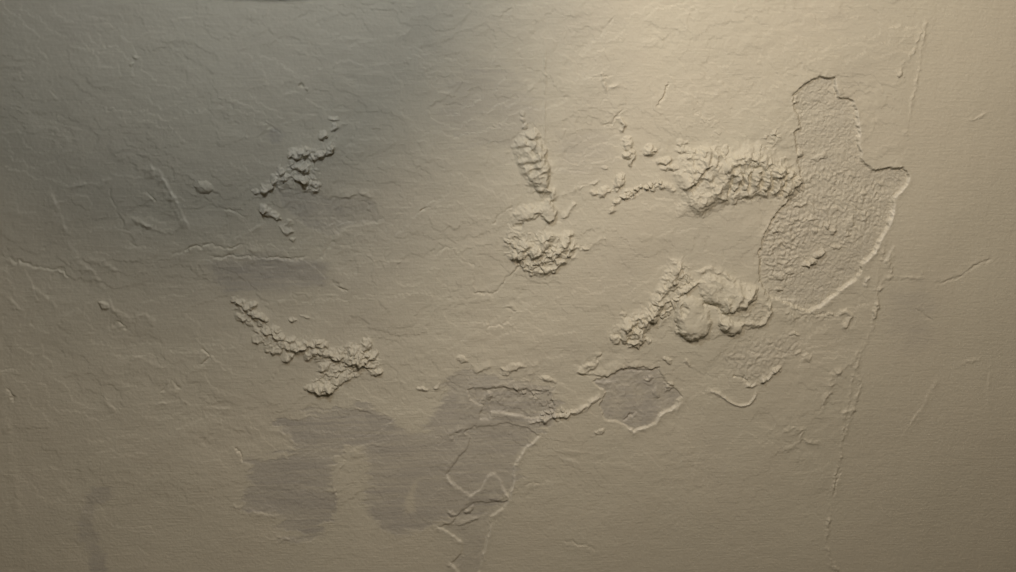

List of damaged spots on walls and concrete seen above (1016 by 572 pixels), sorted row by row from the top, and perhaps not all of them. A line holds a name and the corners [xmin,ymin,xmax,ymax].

peeling [752,73,914,326]
leakage [239,357,507,545]
peeling [455,348,692,436]